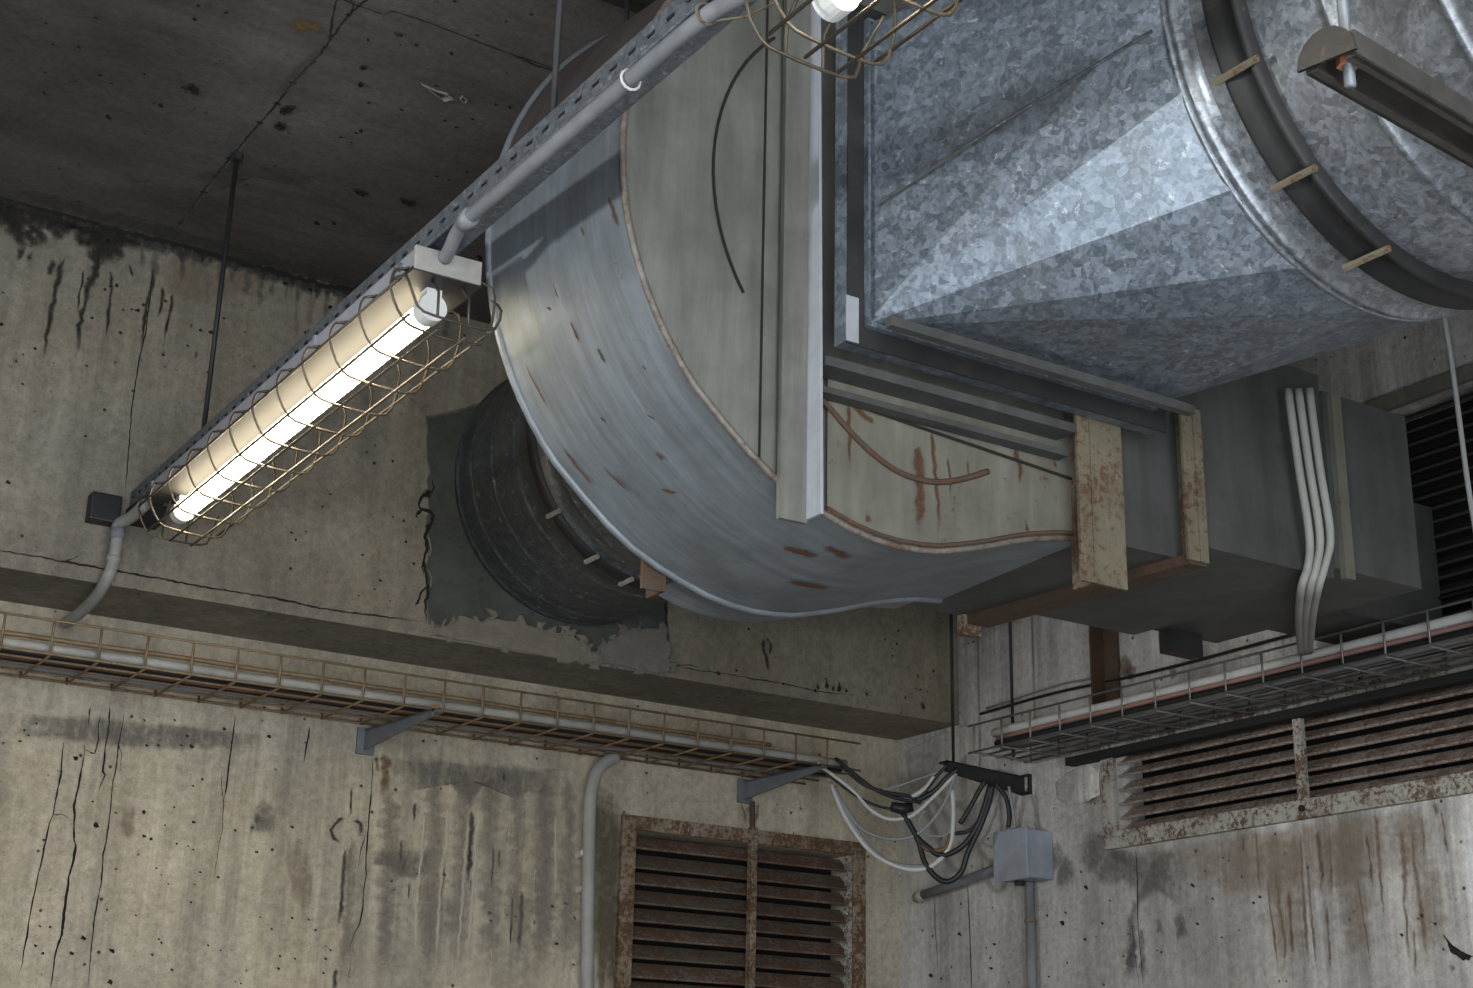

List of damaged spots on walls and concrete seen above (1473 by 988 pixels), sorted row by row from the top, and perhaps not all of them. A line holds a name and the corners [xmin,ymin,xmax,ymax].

water stain [0,203,136,347]
water stain [142,269,173,339]
crack [0,0,552,491]
peeling [470,608,624,670]
water stain [330,790,363,951]
water stain [380,762,575,980]
water stain [594,806,620,982]